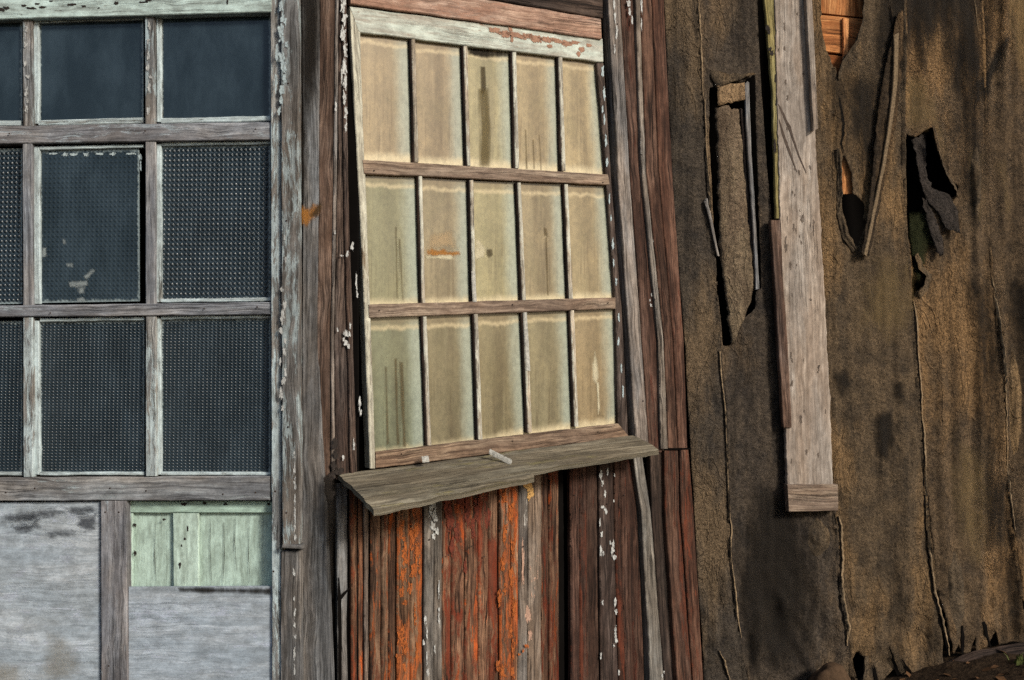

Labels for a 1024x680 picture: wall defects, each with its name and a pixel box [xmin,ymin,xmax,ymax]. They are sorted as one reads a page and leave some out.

peeling [275,0,288,115]
peeling [335,0,348,131]
peeling [489,27,592,56]
peeling [599,468,617,560]
peeling [396,488,540,678]